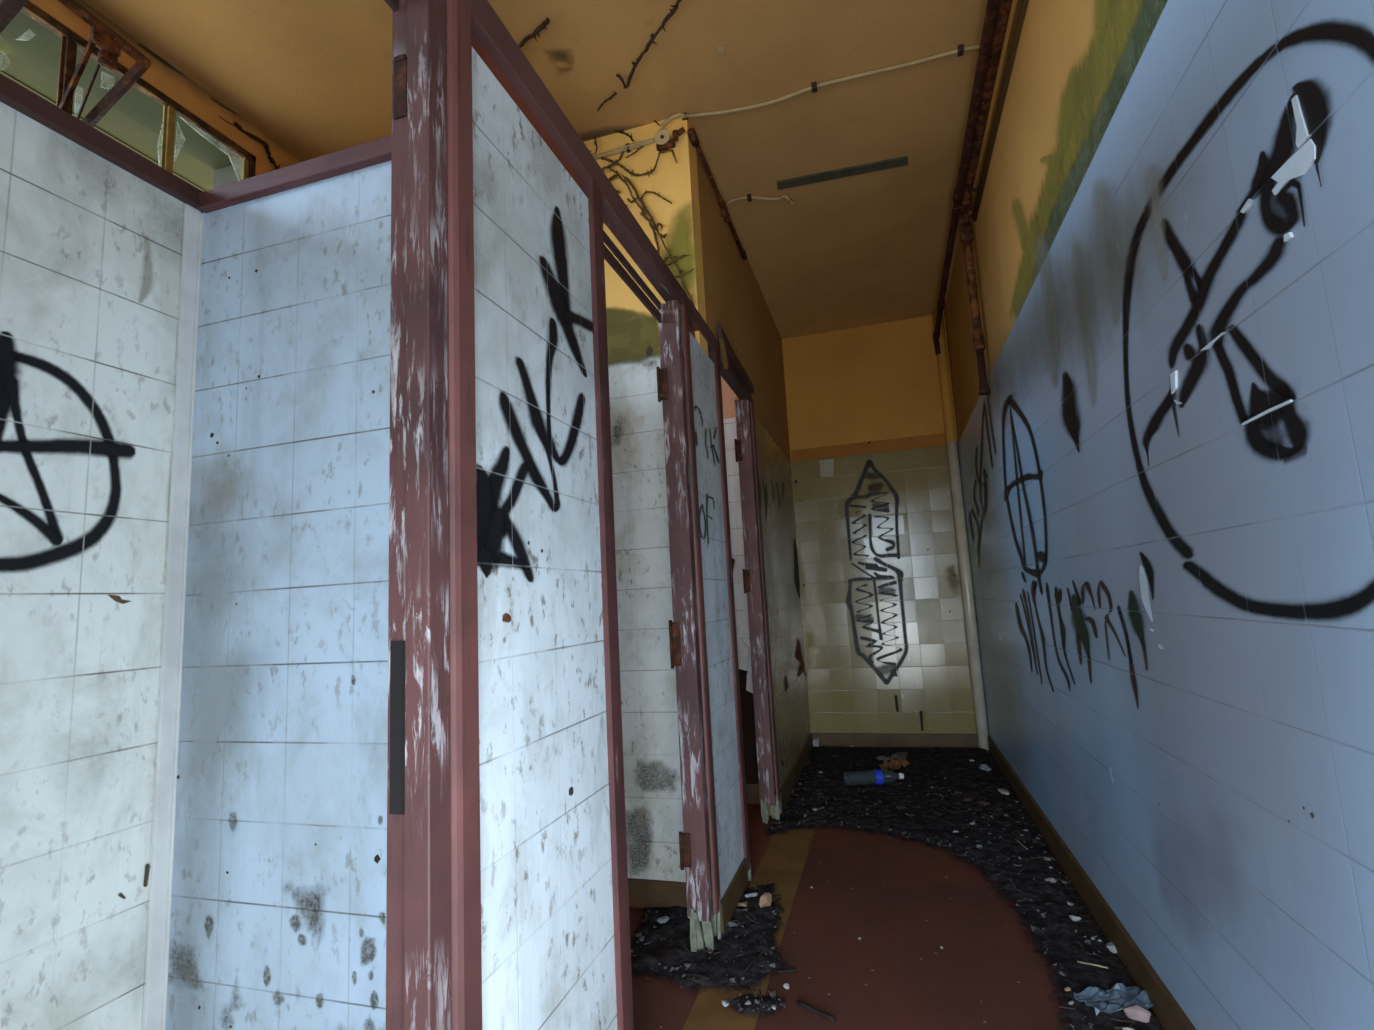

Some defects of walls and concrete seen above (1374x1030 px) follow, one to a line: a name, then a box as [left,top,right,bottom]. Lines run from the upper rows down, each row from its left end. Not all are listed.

leakage [291,892,321,945]
leakage [173,951,199,987]
leakage [352,931,378,1030]